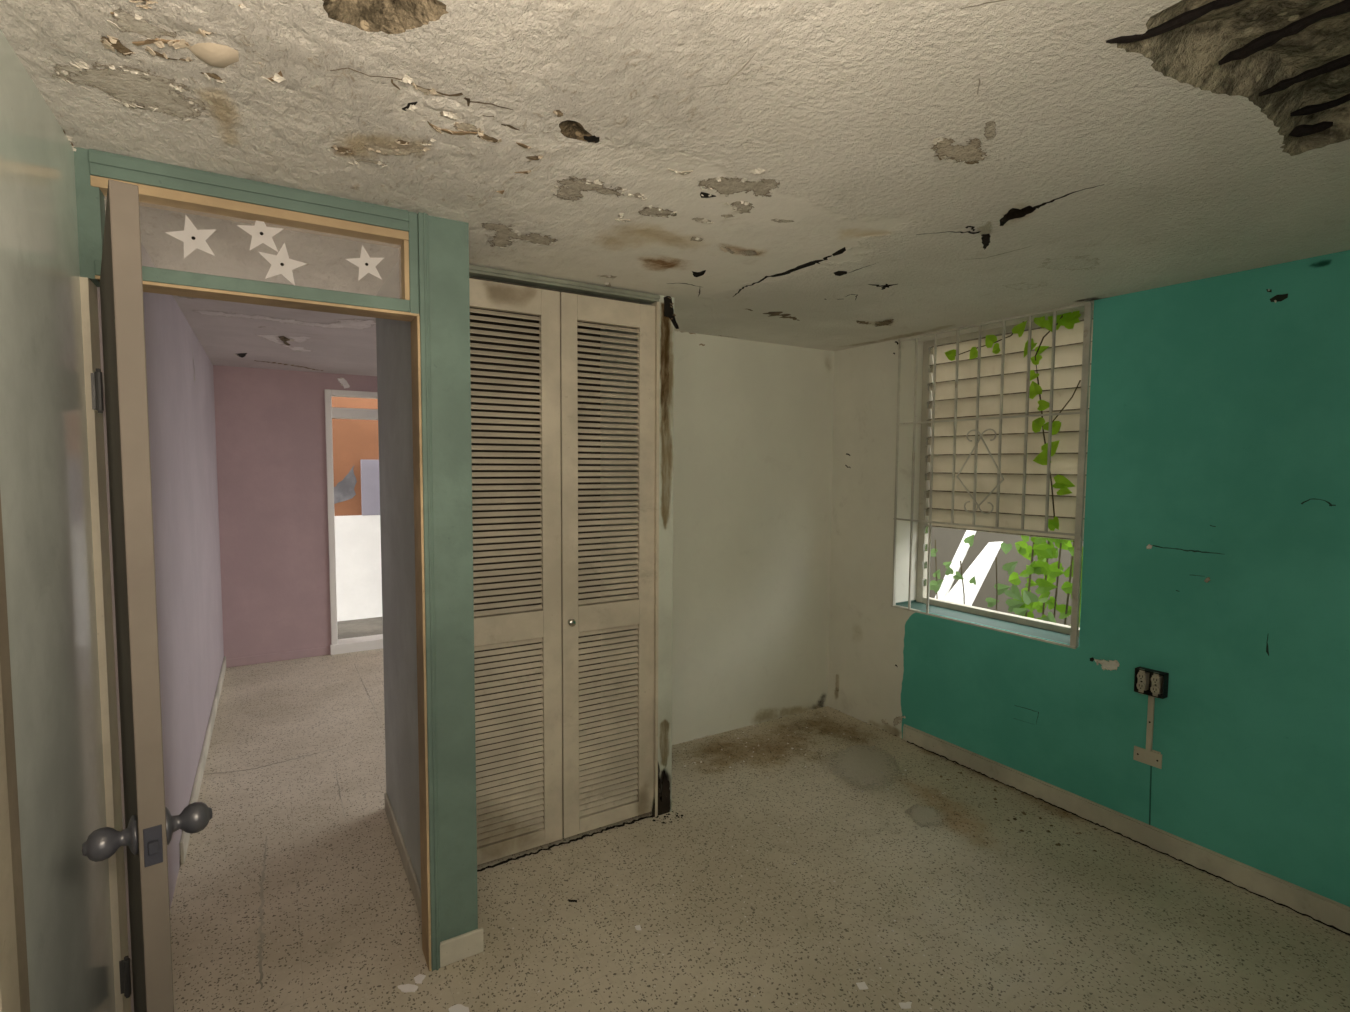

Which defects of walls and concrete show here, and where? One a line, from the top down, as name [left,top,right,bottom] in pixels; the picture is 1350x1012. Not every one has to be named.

spalling [322,0,449,34]
peeling [50,0,226,122]
spalling [1106,0,1350,156]
spalling [553,110,600,143]
peeling [930,121,996,164]
peeling [551,176,676,223]
peeling [667,168,780,241]
crack [1032,185,1101,209]
peeling [482,223,556,249]
crack [917,226,1030,259]
crack [680,247,897,346]
damp [652,764,670,818]